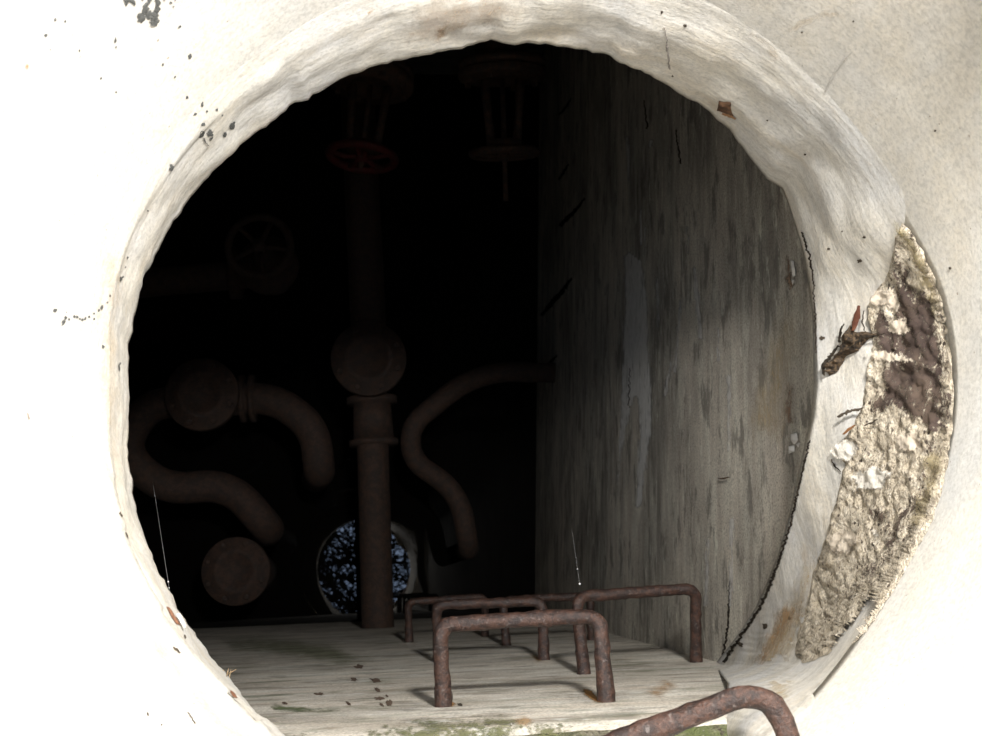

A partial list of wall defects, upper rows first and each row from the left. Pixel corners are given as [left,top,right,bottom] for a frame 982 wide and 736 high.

crack [722,440,841,663]
crack [837,407,878,426]
spalling [795,223,954,663]